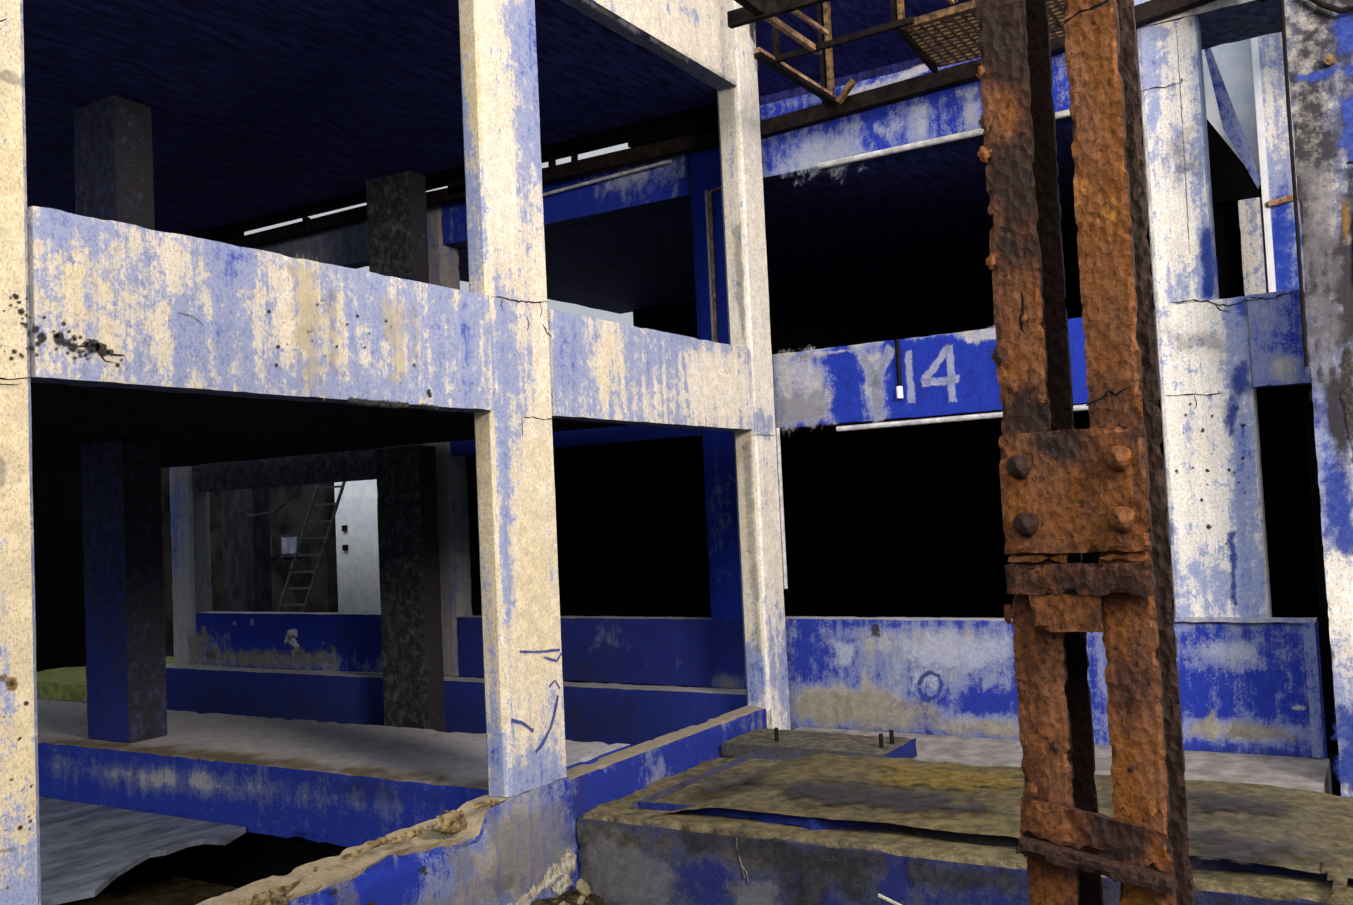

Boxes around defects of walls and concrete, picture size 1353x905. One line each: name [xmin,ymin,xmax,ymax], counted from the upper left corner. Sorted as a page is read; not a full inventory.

corrosion [978,113,992,163]
corrosion [986,252,998,270]
spalling [0,294,123,367]
peeling [348,389,439,409]
corrosion [991,346,1047,406]
spalling [340,798,506,860]
spalling [237,866,318,905]